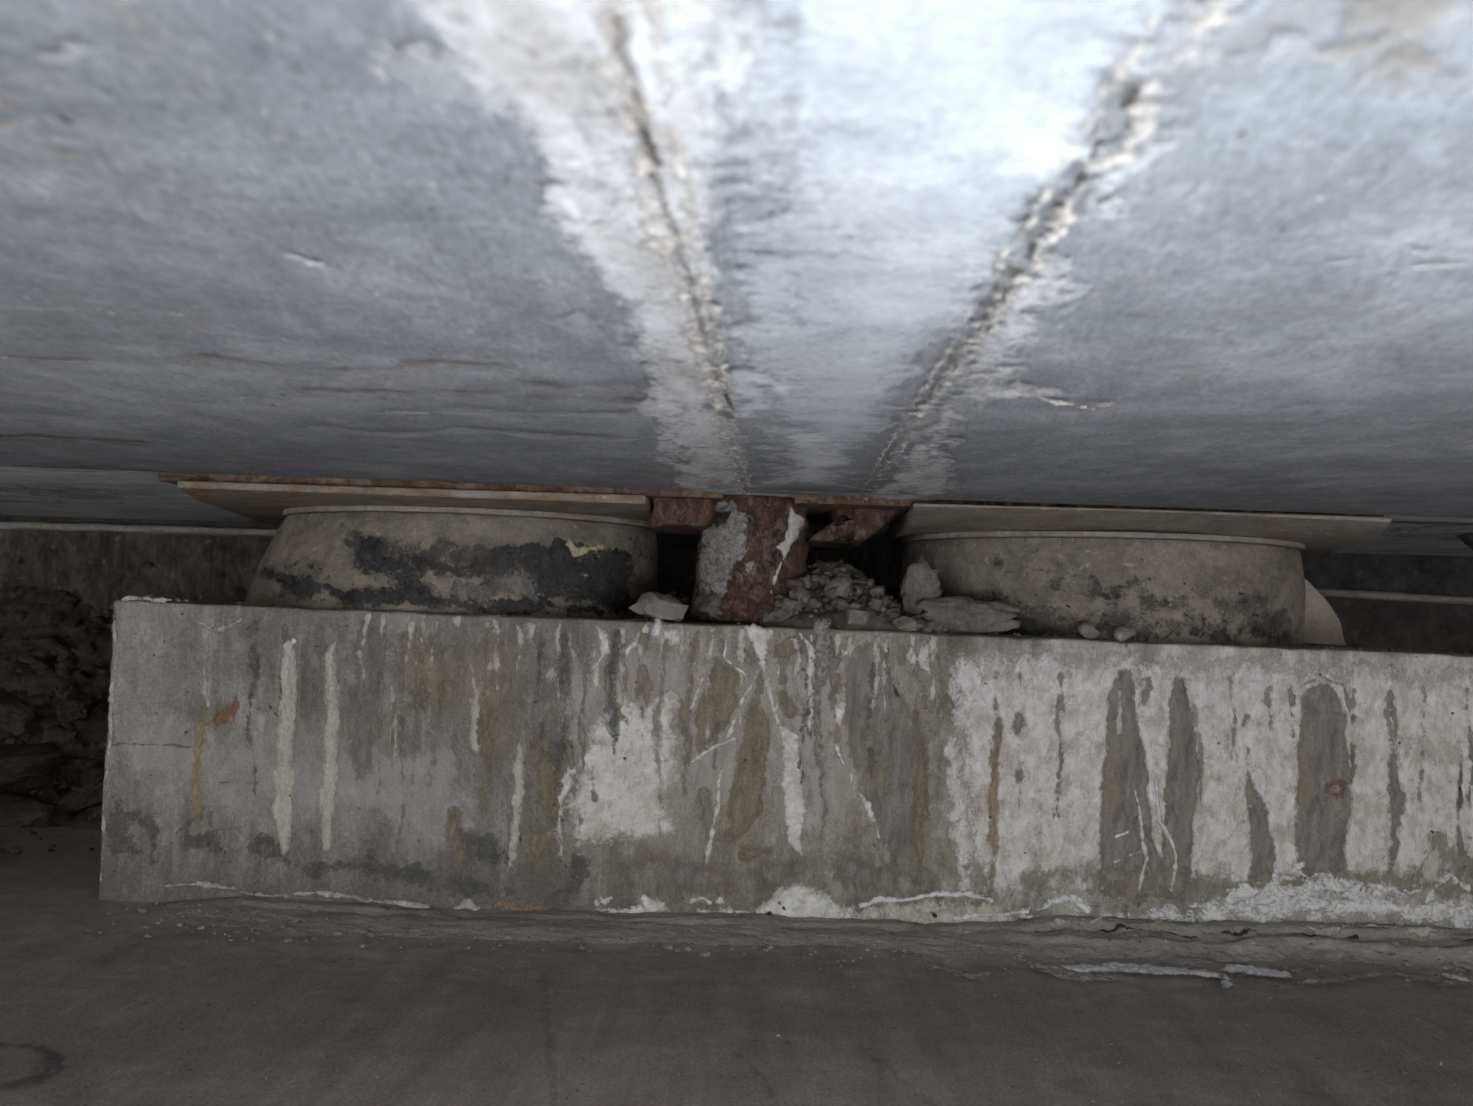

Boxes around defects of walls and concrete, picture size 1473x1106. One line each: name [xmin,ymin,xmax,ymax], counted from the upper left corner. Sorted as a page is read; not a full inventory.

crack [589,0,753,495]
damp [377,0,1225,500]
crack [855,0,1243,501]
rust [191,656,240,824]
damp [106,612,1473,938]